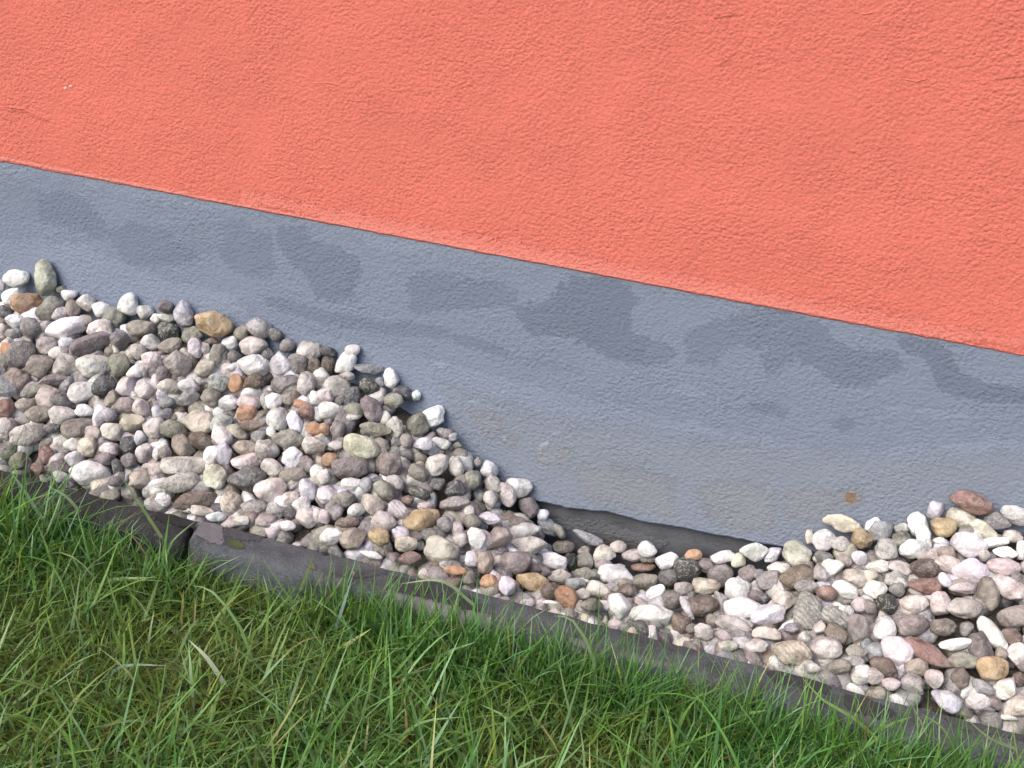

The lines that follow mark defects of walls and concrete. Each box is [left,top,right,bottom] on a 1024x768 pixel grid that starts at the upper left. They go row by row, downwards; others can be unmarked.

damp [0,173,1024,453]
corrosion [838,487,865,508]